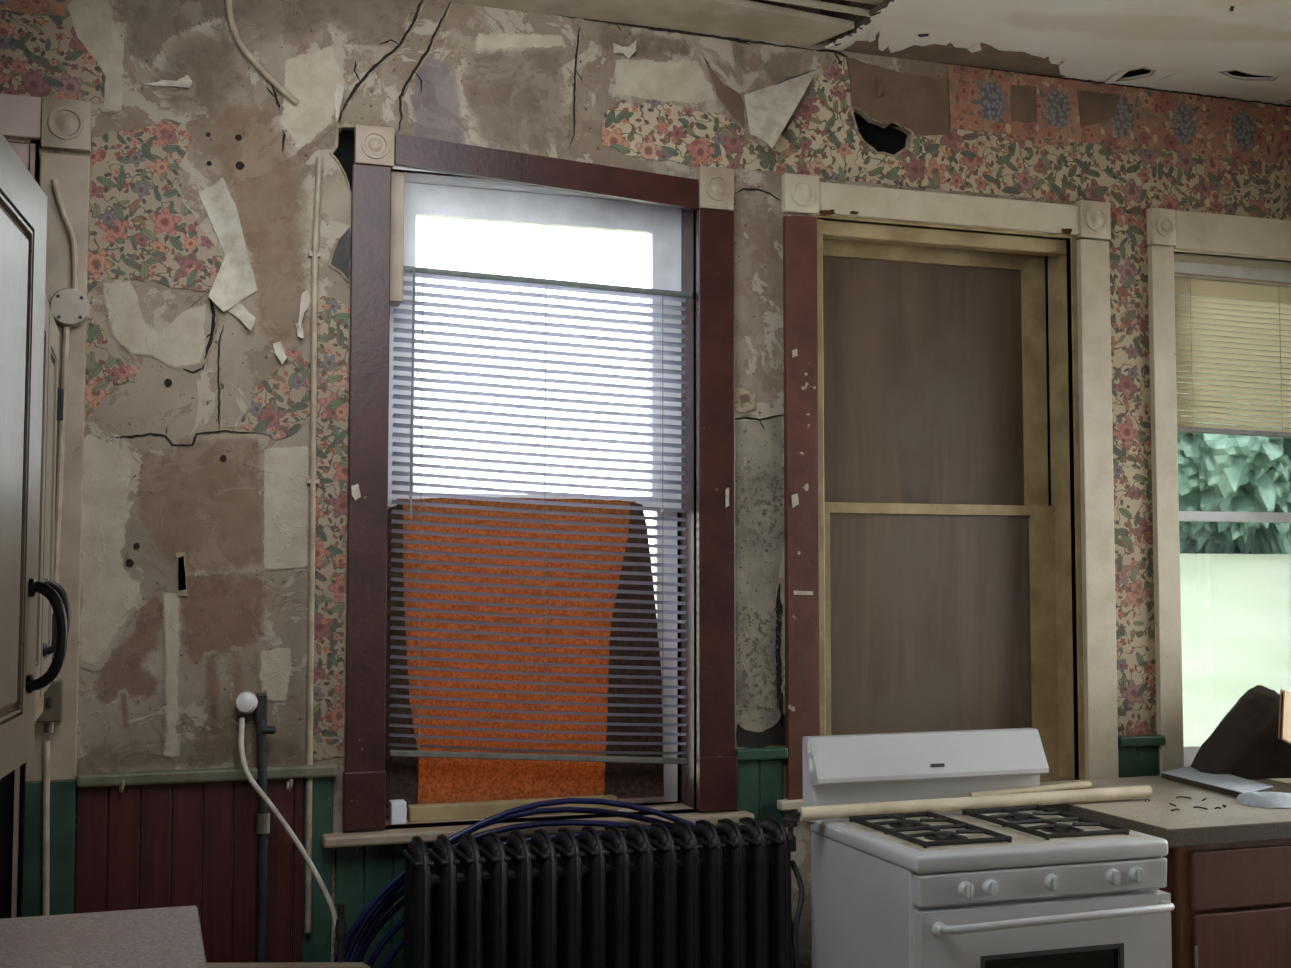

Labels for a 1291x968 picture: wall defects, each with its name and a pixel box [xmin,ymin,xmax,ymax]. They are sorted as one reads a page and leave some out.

peeling [146,75,193,88]
crack [339,0,453,134]
peeling [613,40,636,59]
peeling [830,0,1068,77]
flaking render [329,83,356,194]
flaking render [850,107,914,157]
flaking render [328,227,351,283]
peeling [295,290,311,339]
crack [116,292,259,447]
peeling [273,341,287,364]
flaking render [176,552,188,596]